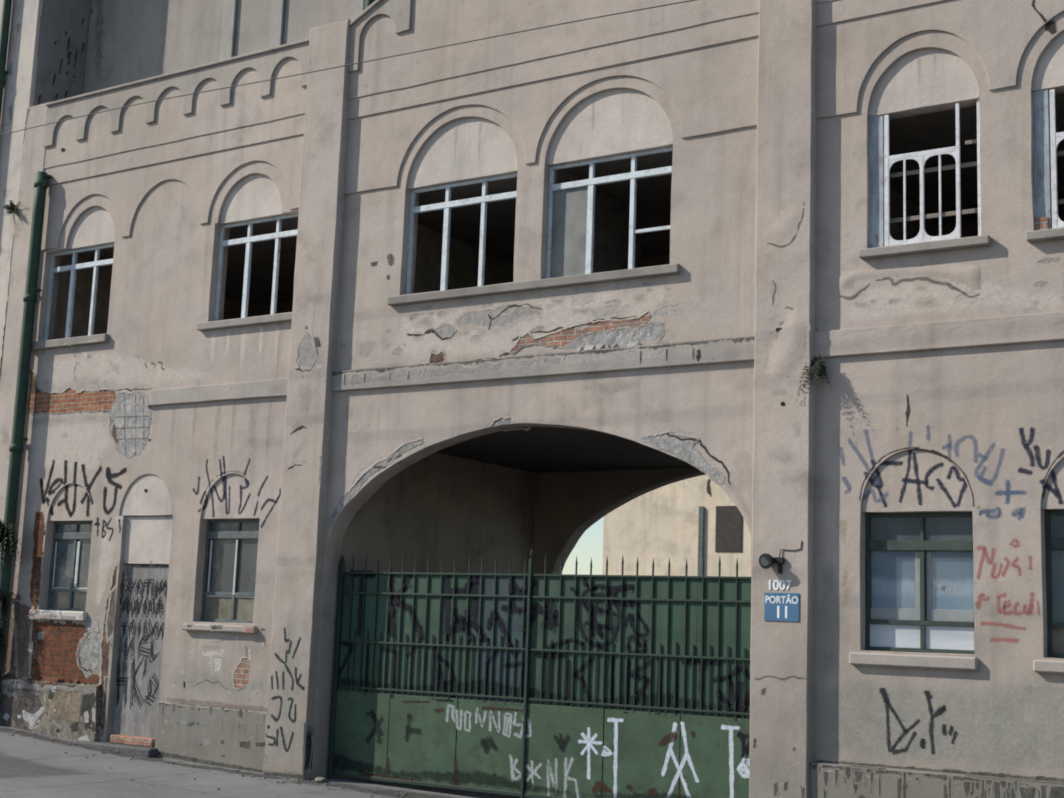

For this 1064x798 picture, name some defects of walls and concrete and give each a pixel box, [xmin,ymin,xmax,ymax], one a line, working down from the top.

crack [1032,0,1057,34]
peeling [301,280,686,389]
flaking render [26,353,156,467]
spalling [633,425,731,486]
flaking render [1,505,128,742]
spalling [197,641,255,691]
leakage [750,514,1064,798]